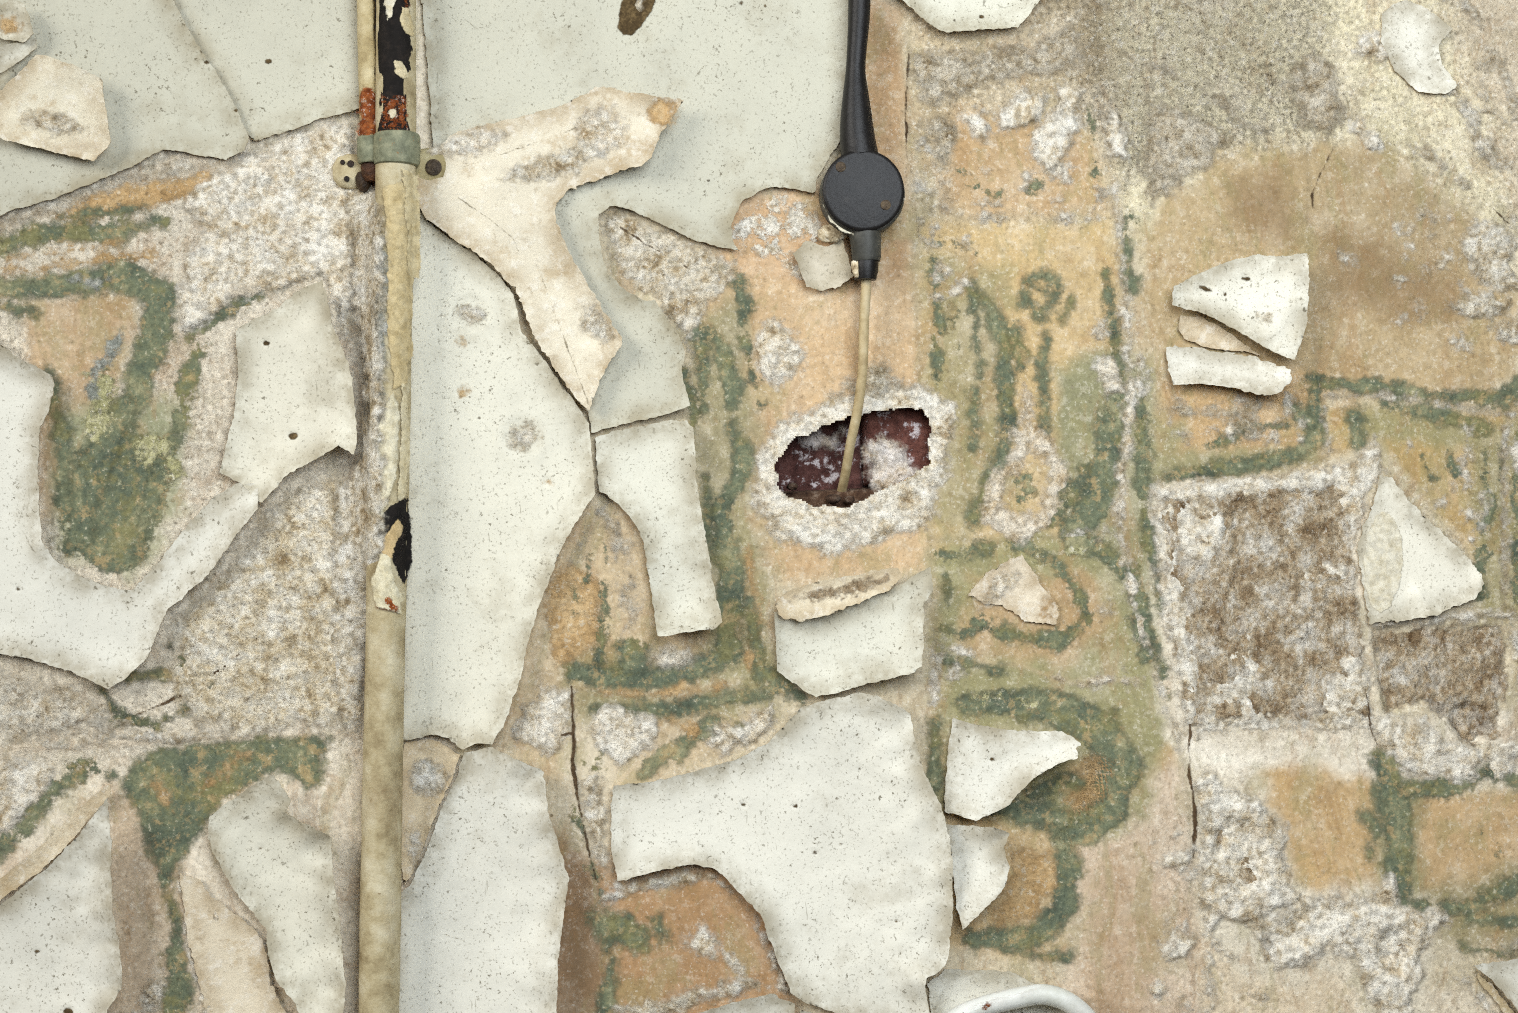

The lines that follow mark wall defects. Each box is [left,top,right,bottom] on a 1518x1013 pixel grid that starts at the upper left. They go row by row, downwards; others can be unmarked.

corrosion [355,88,409,136]
peeling [219,280,357,502]
peeling [377,498,412,584]
flaking render [793,240,854,291]
flaking render [775,568,902,622]
spalling [774,408,932,508]
leakage [511,85,1518,1013]
peeling [1166,253,1310,396]
spalling [1161,405,1513,746]
peeling [0,785,123,1013]
peeling [180,774,346,1013]
peeling [944,718,1081,930]